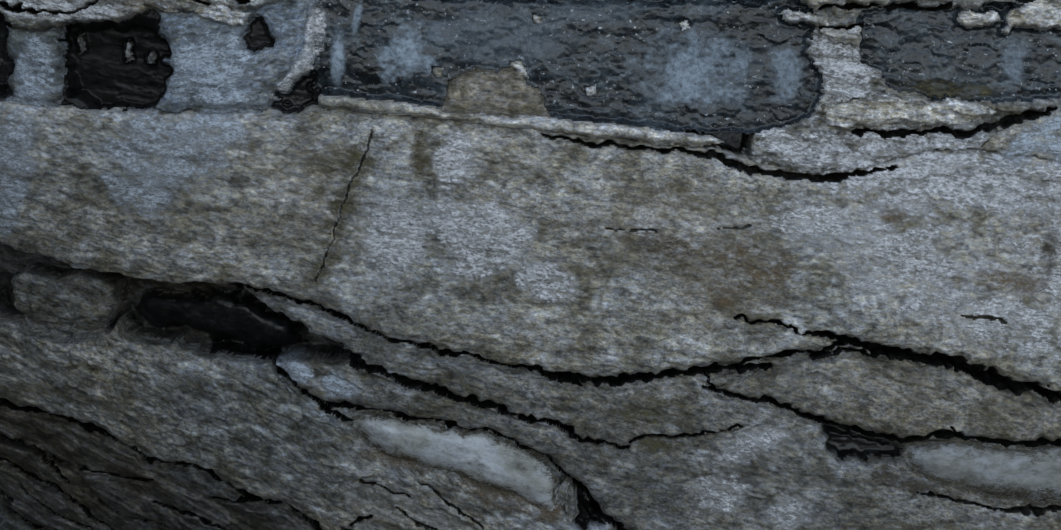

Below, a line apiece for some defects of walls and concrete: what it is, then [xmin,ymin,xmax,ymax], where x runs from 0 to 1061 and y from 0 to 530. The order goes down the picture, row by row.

peeling [190,5,252,27]
peeling [778,0,890,47]
peeling [957,0,1061,34]
peeling [77,33,86,53]
peeling [125,41,157,63]
peeling [510,61,529,79]
crack [245,130,1061,530]
crack [0,398,484,530]